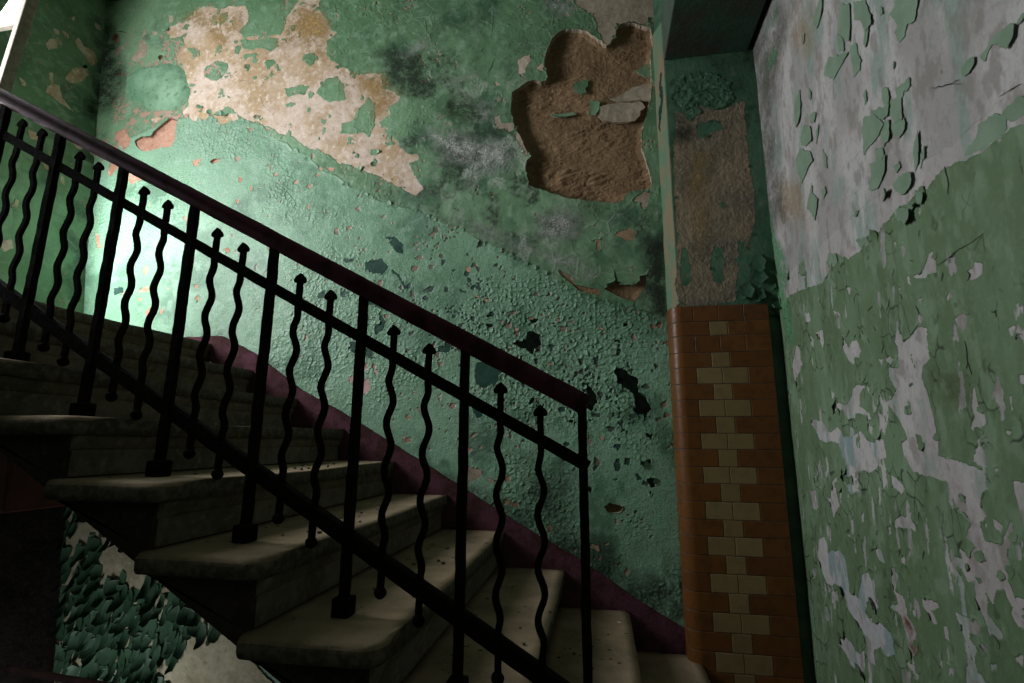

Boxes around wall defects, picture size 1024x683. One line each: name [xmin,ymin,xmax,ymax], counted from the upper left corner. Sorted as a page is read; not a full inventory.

peeling [824,0,918,80]
peeling [113,0,423,196]
flaking render [494,0,654,210]
peeling [108,162,141,184]
peeling [673,77,1024,309]
peeling [474,238,654,321]
peeling [512,318,543,355]
peeling [793,312,824,386]
peeling [610,365,654,439]
peeling [642,459,660,495]
peeling [800,327,1024,683]
peeling [51,507,272,683]